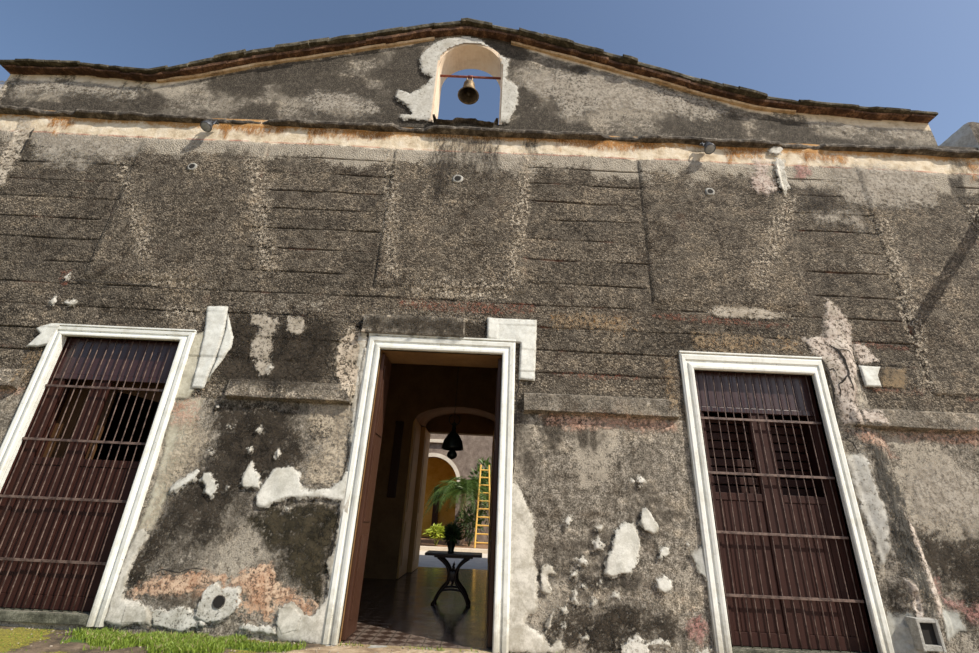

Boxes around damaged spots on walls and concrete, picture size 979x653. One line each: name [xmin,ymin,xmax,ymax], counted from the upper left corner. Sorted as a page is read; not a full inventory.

corrosion [220,124,284,139]
corrosion [307,128,391,143]
peeling [395,90,412,107]
corrosion [559,139,654,151]
peeling [743,146,798,289]
flaking render [250,313,304,376]
peeling [142,398,214,531]
water stain [126,313,337,588]
crack [821,344,867,466]
peeling [127,561,319,622]
water stain [248,500,339,604]
water stain [868,440,979,629]